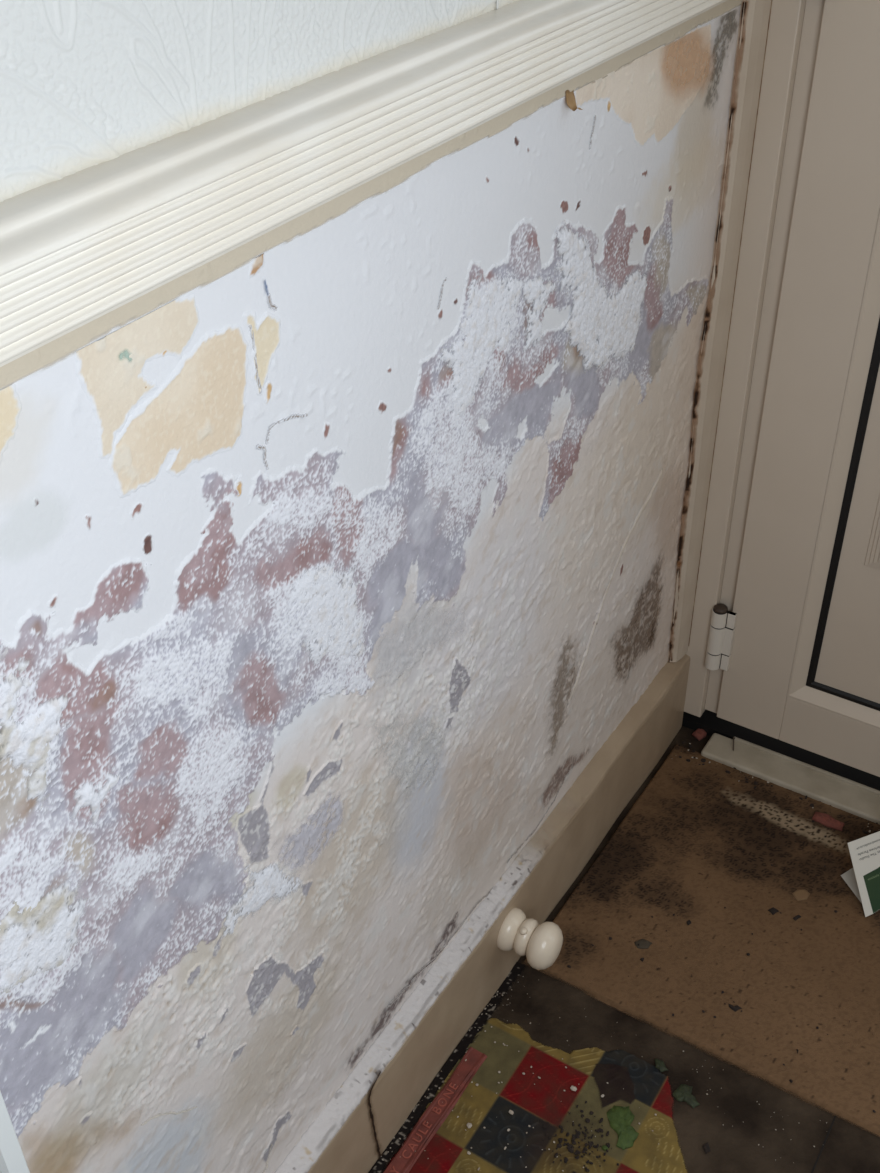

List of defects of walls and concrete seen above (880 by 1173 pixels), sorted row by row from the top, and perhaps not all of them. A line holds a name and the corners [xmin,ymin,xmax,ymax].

peeling [0,184,709,1138]
water stain [552,647,573,744]
water stain [616,565,661,671]
water stain [544,755,583,802]
water stain [223,798,342,937]
water stain [275,841,545,1173]
peeling [260,1110,292,1164]